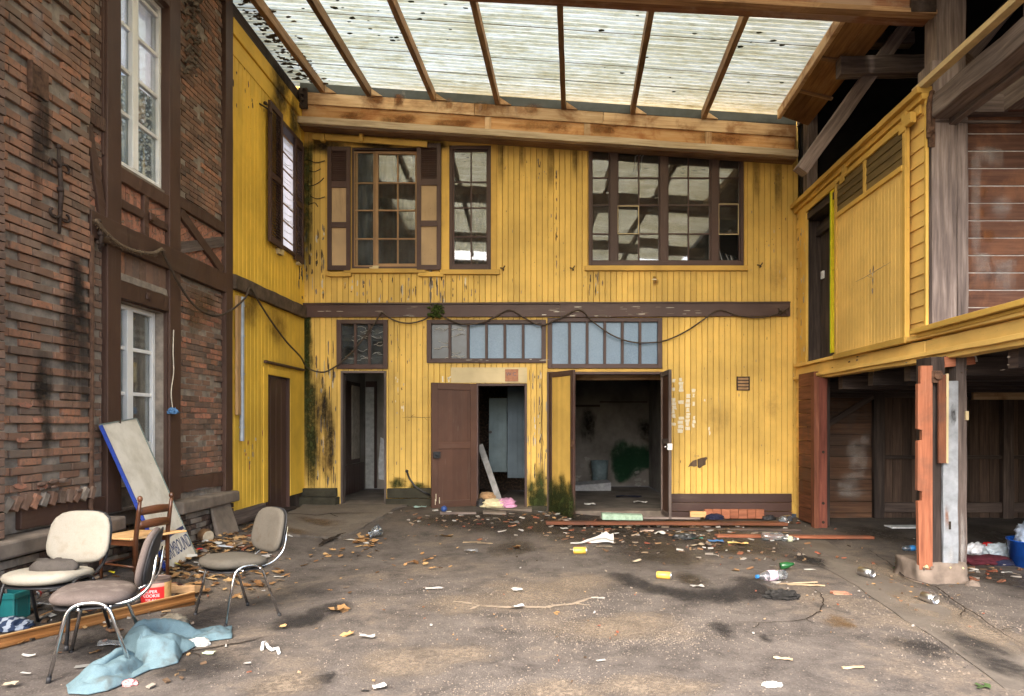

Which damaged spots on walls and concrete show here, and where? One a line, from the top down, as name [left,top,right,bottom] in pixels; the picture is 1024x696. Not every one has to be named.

peeling [298,209,325,312]
peeling [344,270,476,317]
leakage [321,390,334,466]
peeling [680,457,707,468]